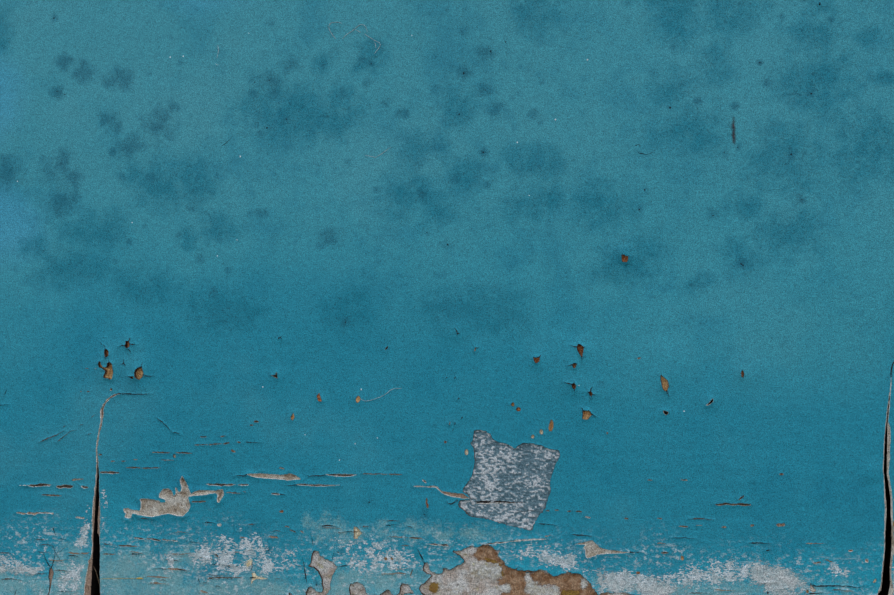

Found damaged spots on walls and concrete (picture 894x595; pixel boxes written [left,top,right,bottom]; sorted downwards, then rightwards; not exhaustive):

leakage [621,0,894,298]
leakage [496,136,670,289]
leakage [0,490,108,595]
crack [14,390,262,595]
peeling [120,472,228,522]
leakage [103,527,307,595]
peeling [286,548,339,595]
peeling [411,418,562,533]
peeling [346,541,638,595]
leakage [299,510,875,595]
peeling [572,537,643,561]
crack [869,362,894,595]